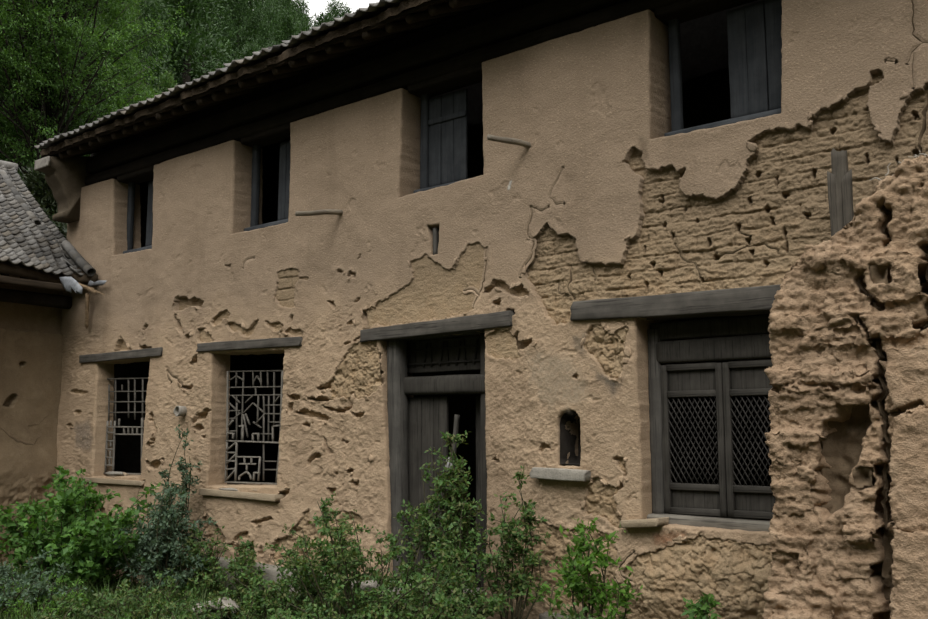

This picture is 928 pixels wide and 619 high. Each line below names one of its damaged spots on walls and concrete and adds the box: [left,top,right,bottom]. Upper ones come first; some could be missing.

crack [886,0,928,154]
crack [519,168,564,277]
flaking render [363,72,928,327]
flaking render [199,265,309,342]
flaking render [307,339,383,411]
flaking render [486,327,533,360]
flaking render [580,322,632,383]
crack [920,304,928,328]
crack [855,278,905,619]
flaking render [203,513,249,556]
flaking render [261,511,367,577]